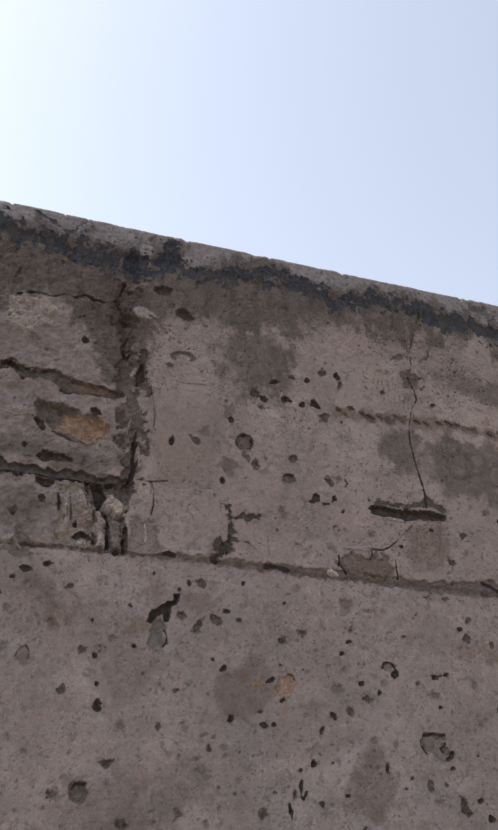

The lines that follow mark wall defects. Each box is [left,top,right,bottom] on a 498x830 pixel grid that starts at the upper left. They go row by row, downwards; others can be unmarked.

spalling [154,285,173,296]
leakage [0,205,498,396]
spalling [0,280,156,556]
crack [394,306,428,508]
crack [0,456,168,515]
spalling [368,497,447,532]
leakage [379,430,498,504]
crack [367,526,412,580]
spalling [147,579,206,648]
spalling [192,609,242,633]
spalling [420,732,456,770]